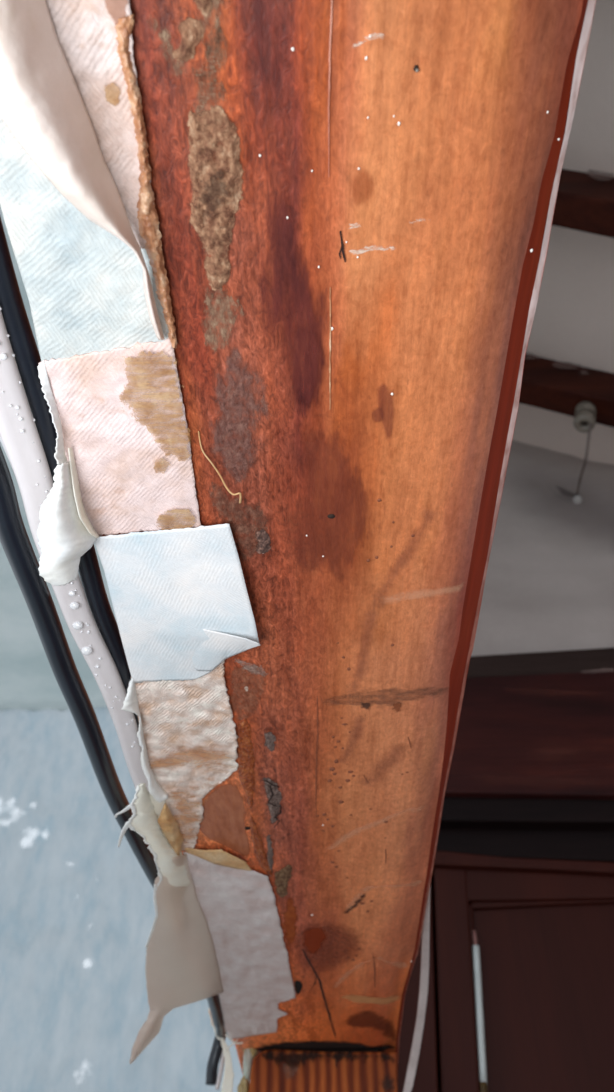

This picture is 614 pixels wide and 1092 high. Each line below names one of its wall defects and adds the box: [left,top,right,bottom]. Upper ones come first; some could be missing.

peeling [0,0,165,341]
peeling [199,784,249,855]
spalling [262,778,292,897]
damp [282,898,361,971]